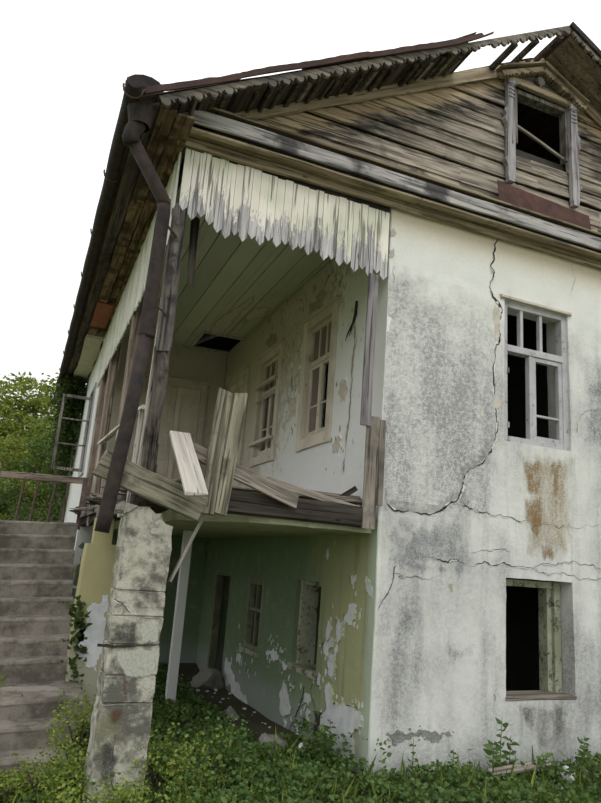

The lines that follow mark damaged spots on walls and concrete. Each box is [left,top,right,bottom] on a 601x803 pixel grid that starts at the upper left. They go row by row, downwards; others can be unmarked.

crack [341,301,359,473]
crack [388,239,599,529]
crack [429,548,601,581]
peeling [75,595,109,671]
peeling [223,641,256,705]
flaking render [265,574,373,767]
flaking render [386,725,454,746]